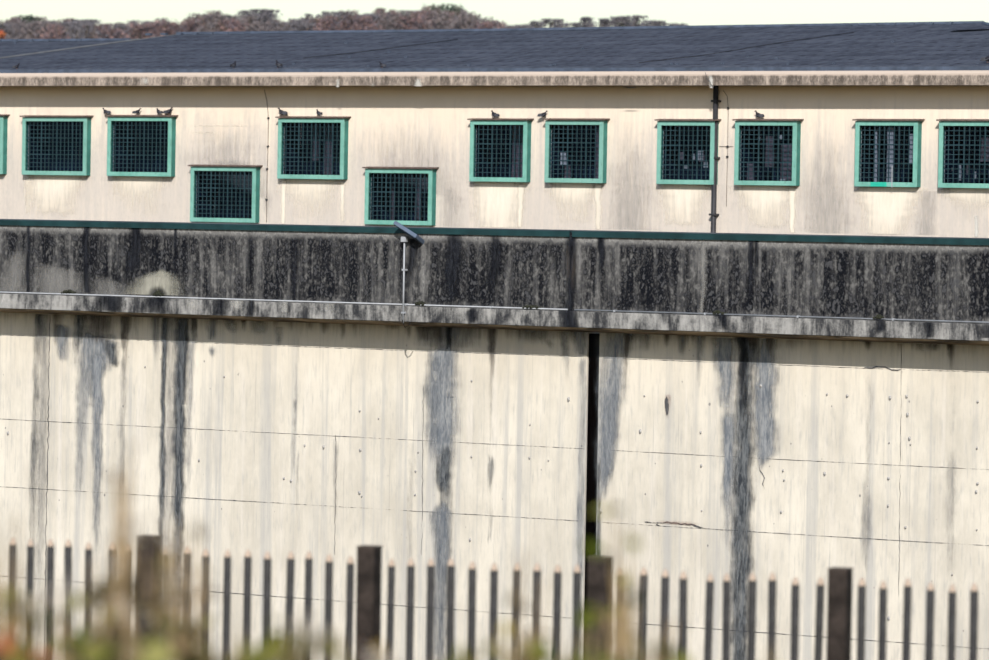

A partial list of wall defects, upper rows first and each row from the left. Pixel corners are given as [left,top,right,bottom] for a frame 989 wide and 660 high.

damp [1,226,31,292]
damp [25,175,80,213]
damp [406,239,417,284]
damp [472,181,524,288]
damp [565,232,576,310]
damp [748,241,758,301]
damp [35,314,129,522]
damp [153,317,197,581]
damp [417,327,473,644]
damp [596,333,649,556]
crack [646,520,702,528]
damp [665,335,776,660]